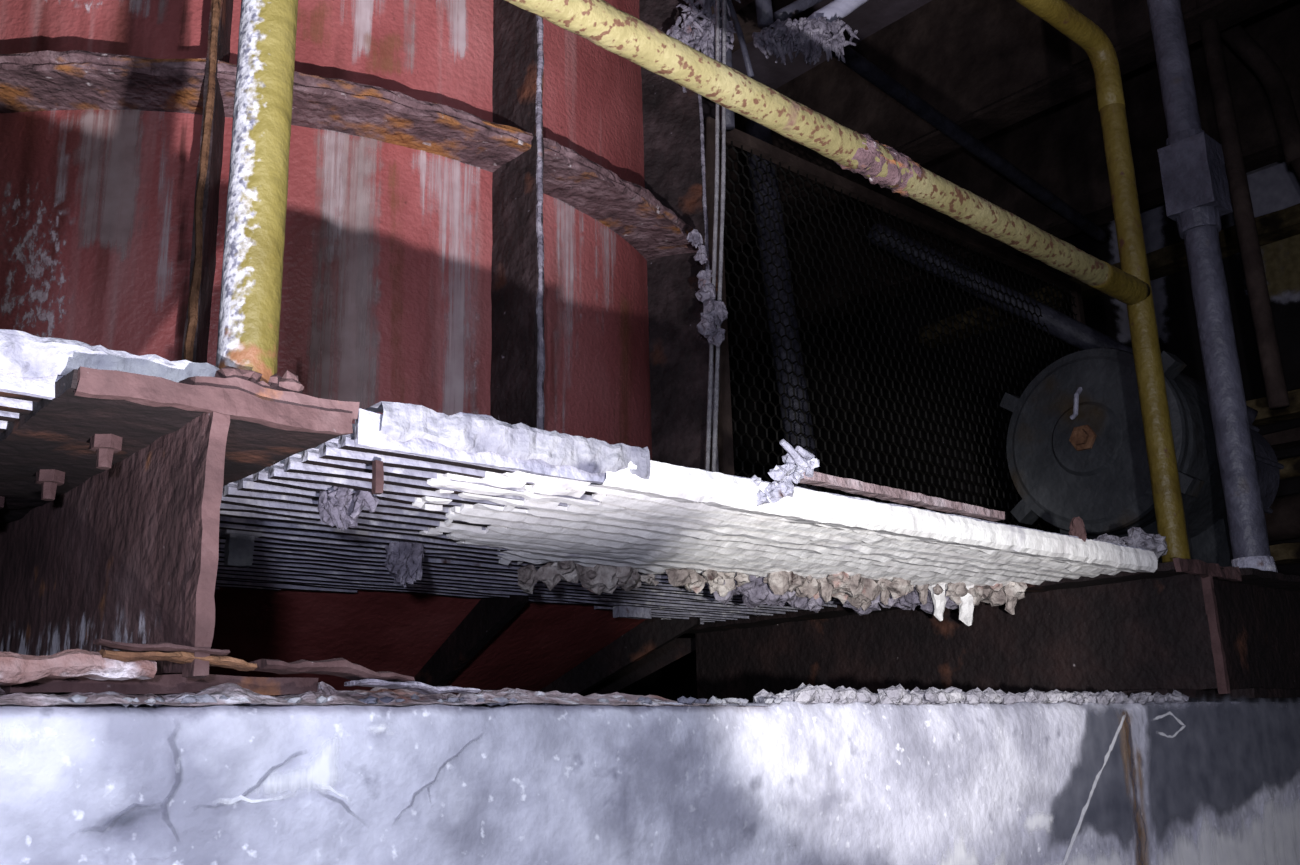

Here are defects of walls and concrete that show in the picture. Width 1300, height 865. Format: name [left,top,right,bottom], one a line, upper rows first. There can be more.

corrosion [178,284,189,360]
leakage [310,131,1158,626]
crack [229,795,268,804]
crack [322,785,345,798]
leakage [1025,706,1134,865]
leakage [1147,698,1300,865]